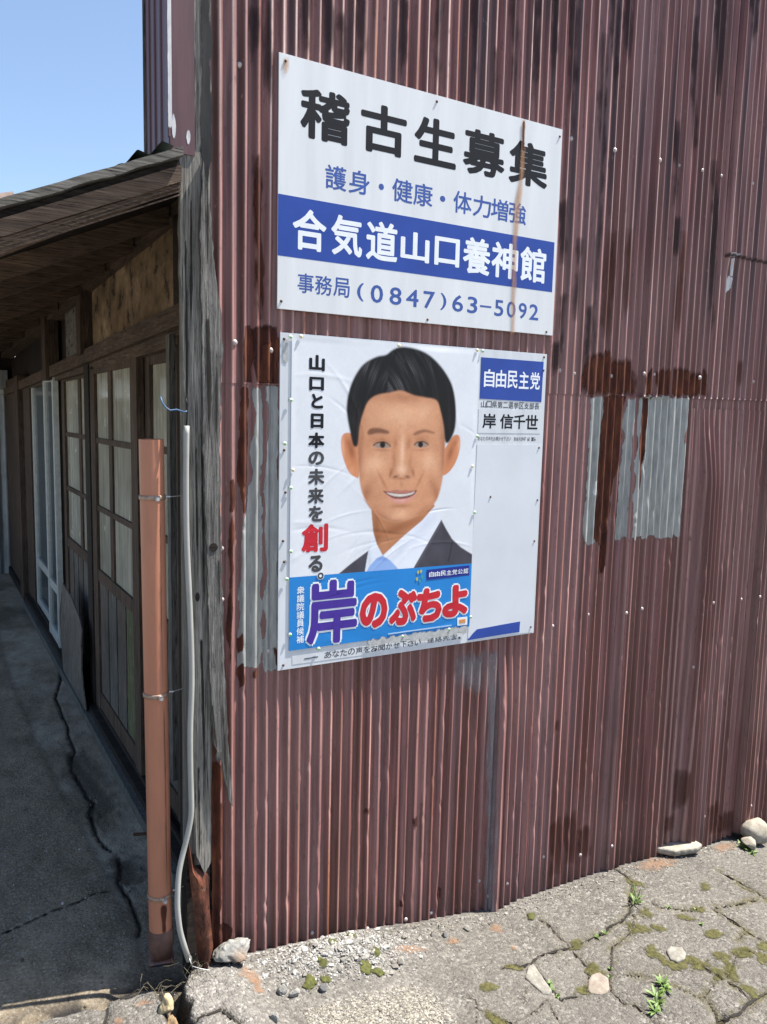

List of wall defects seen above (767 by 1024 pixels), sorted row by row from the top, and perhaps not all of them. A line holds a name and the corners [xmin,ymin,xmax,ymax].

rust [514,121,525,244]
peeling [237,384,279,673]
peeling [583,396,603,546]
rust [581,351,708,573]
peeling [614,394,689,541]
crack [2,677,140,934]
crack [468,869,767,1024]